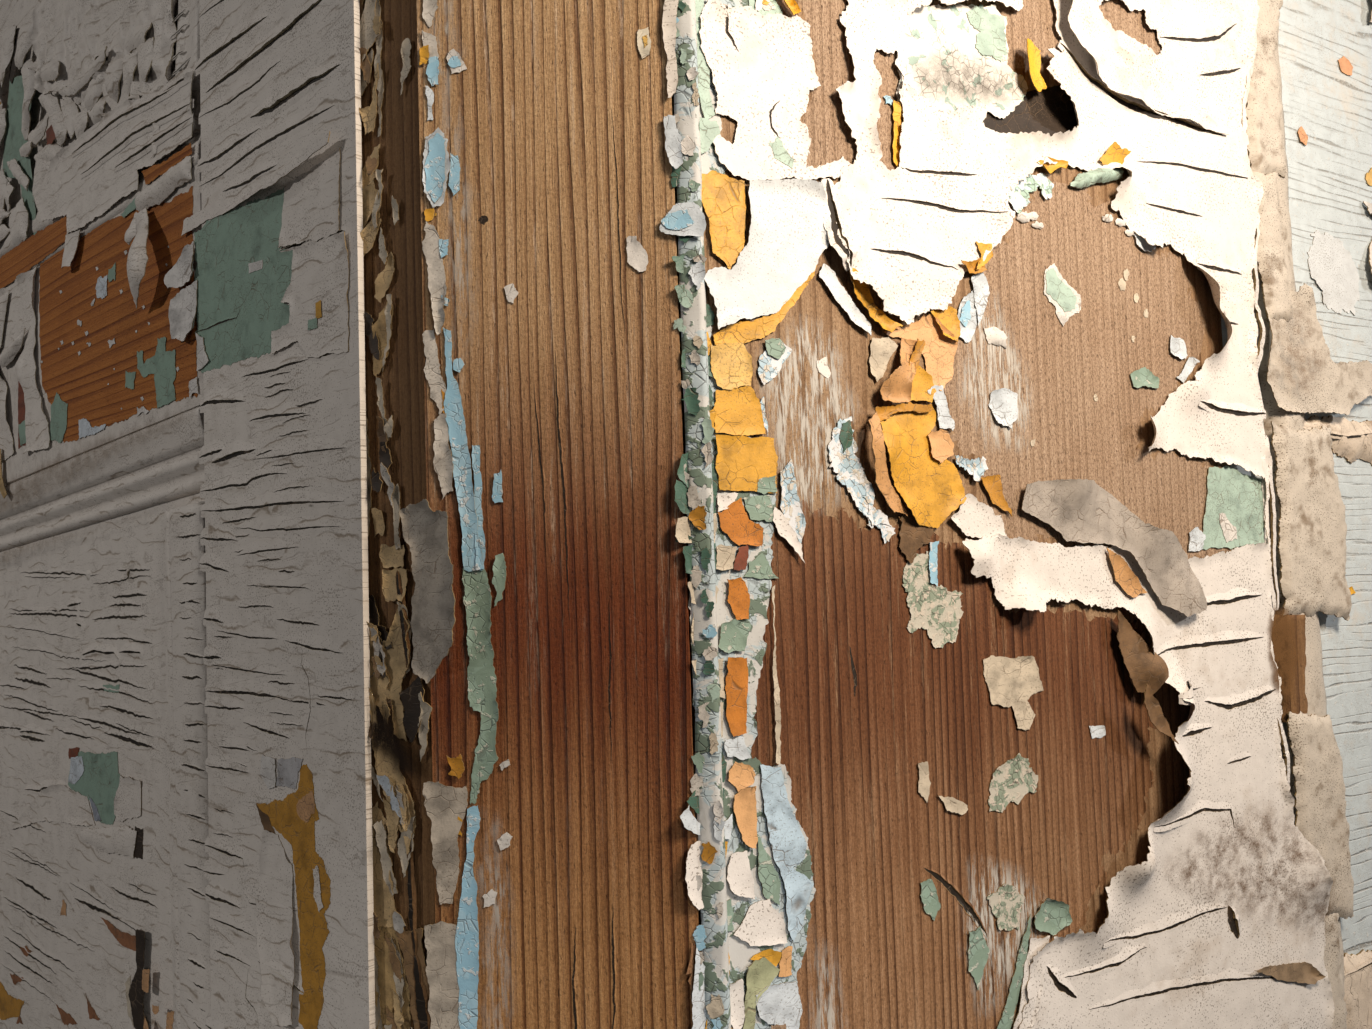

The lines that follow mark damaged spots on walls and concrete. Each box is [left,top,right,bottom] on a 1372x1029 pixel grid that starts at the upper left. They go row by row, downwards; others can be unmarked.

peeling [447,48,467,74]
peeling [1338,56,1353,76]
crack [72,0,341,196]
peeling [1297,126,1308,146]
peeling [1363,167,1372,215]
peeling [504,283,519,304]
peeling [1265,230,1372,415]
peeling [0,0,456,1029]
peeling [637,0,1265,1029]
crack [0,346,353,1029]
peeling [497,832,513,850]
peeling [482,889,498,907]